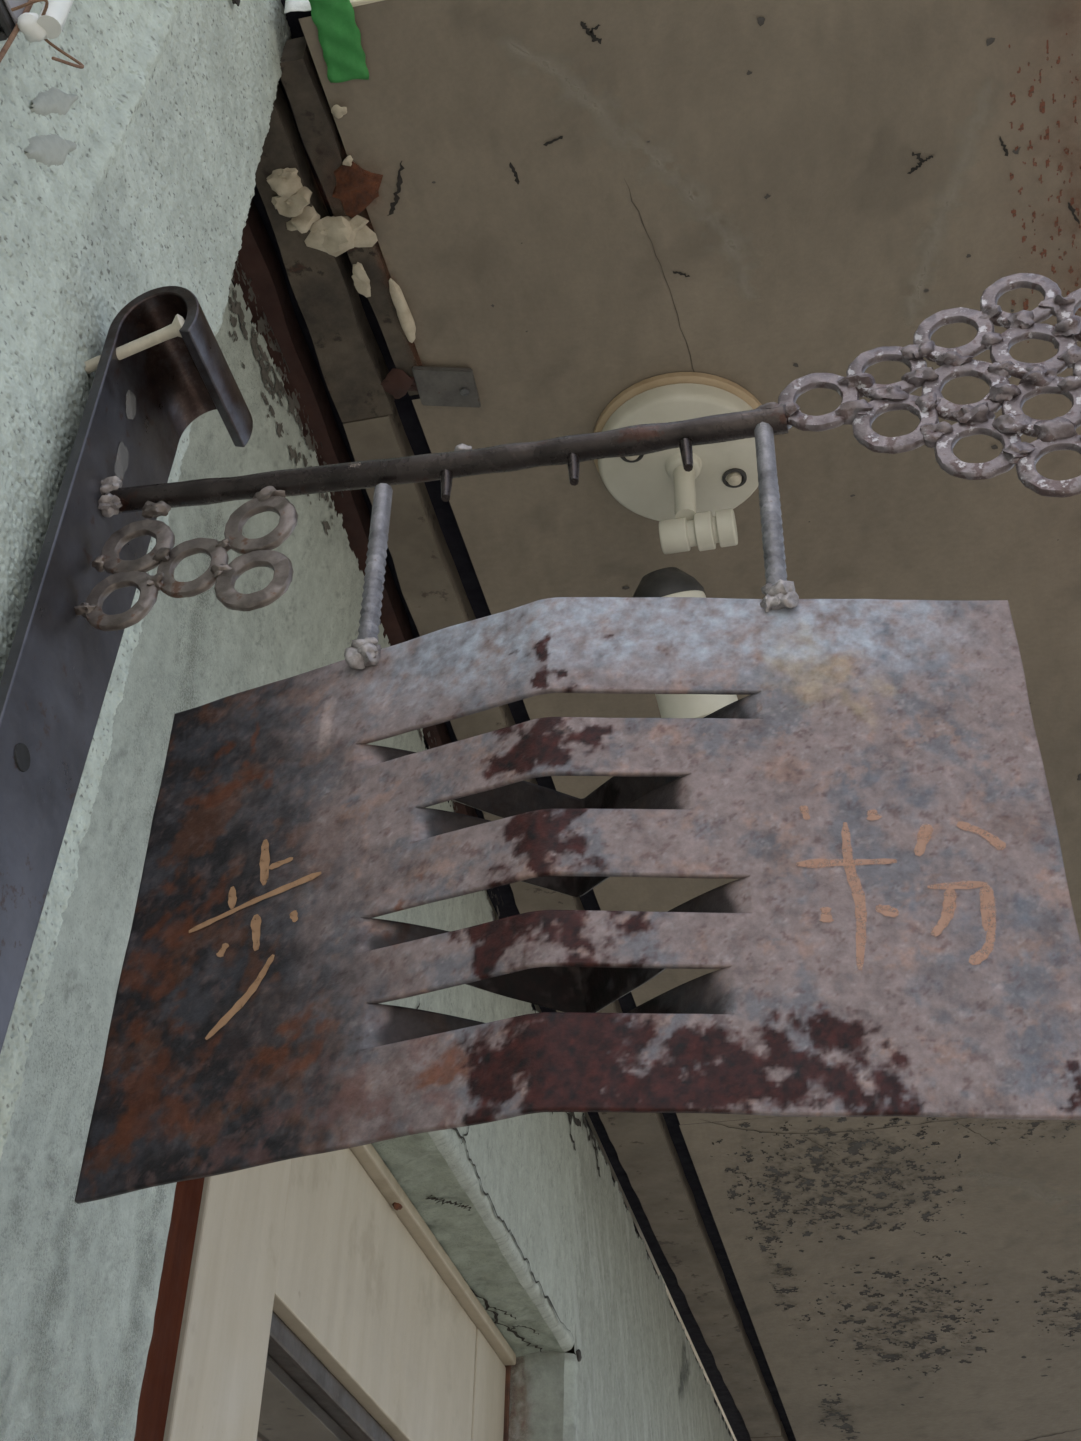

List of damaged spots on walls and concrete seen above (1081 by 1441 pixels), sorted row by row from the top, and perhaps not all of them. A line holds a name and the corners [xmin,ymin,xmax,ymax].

peeling [387,161,405,216]
rust [1009,40,1081,295]
crack [426,1128,572,1352]